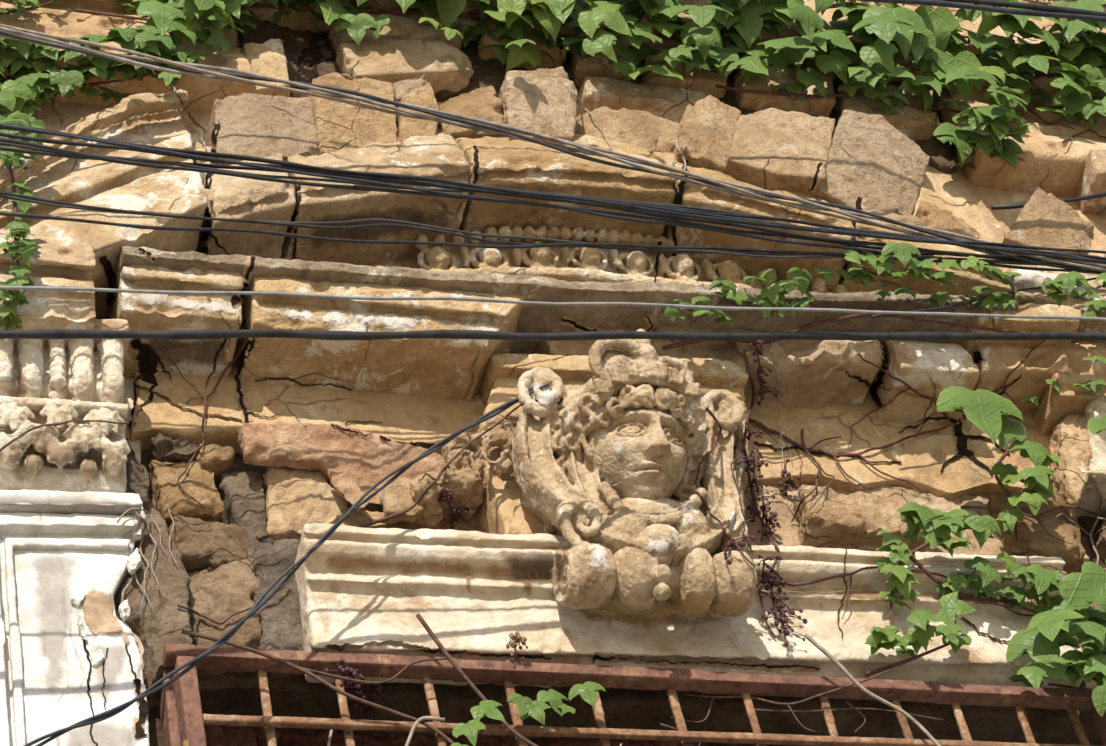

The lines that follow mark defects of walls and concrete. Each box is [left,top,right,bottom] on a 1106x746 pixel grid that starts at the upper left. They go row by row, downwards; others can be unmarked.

crack [470,145,480,183]
crack [654,160,689,283]
crack [127,95,435,448]
crack [845,342,890,408]
crack [973,351,987,363]
crack [998,375,1022,395]
crack [753,441,901,481]
crack [898,415,1010,478]
flaking render [126,521,144,575]
flaking render [70,589,131,668]
crack [83,639,149,746]